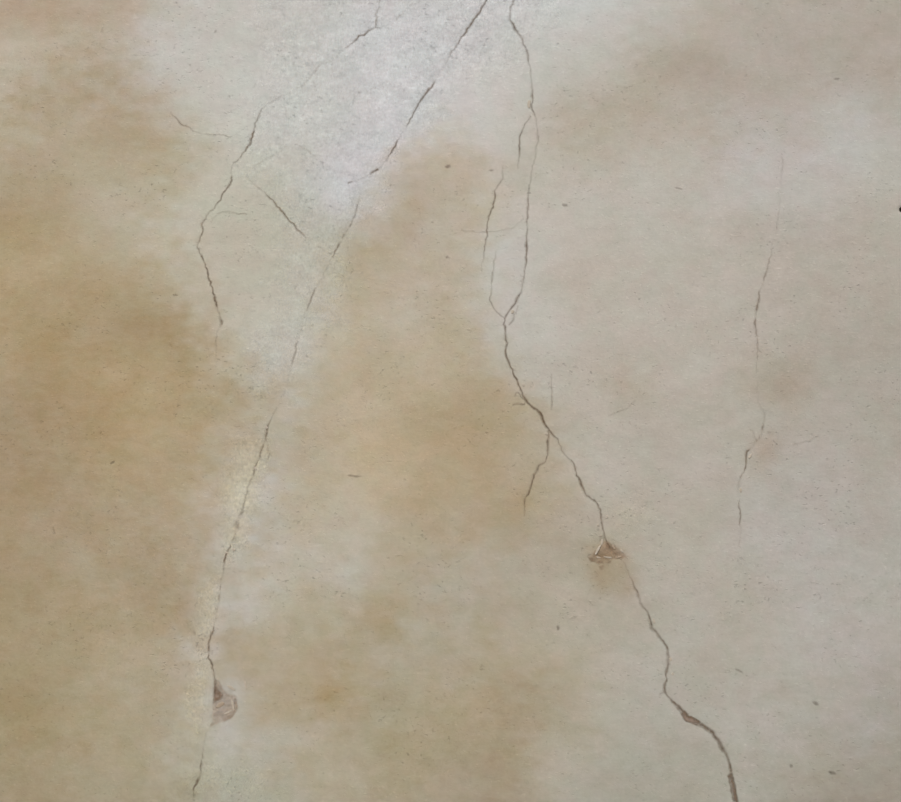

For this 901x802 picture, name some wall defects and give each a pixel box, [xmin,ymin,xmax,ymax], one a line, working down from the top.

crack [505,349,552,435]
crack [664,643,737,802]